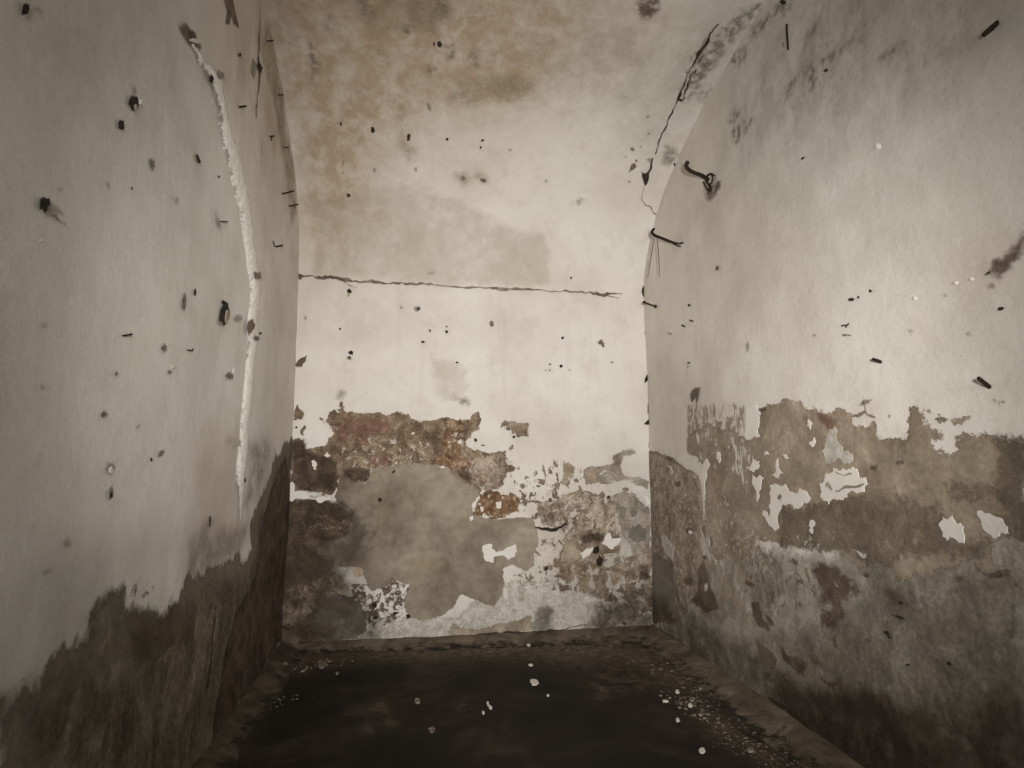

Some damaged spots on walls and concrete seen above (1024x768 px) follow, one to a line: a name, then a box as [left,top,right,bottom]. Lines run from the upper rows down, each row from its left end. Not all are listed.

water stain [639,0,659,17]
crack [641,24,719,214]
crack [298,274,644,299]
water stain [0,437,364,768]
peeling [281,388,1024,676]
water stain [368,536,1024,768]